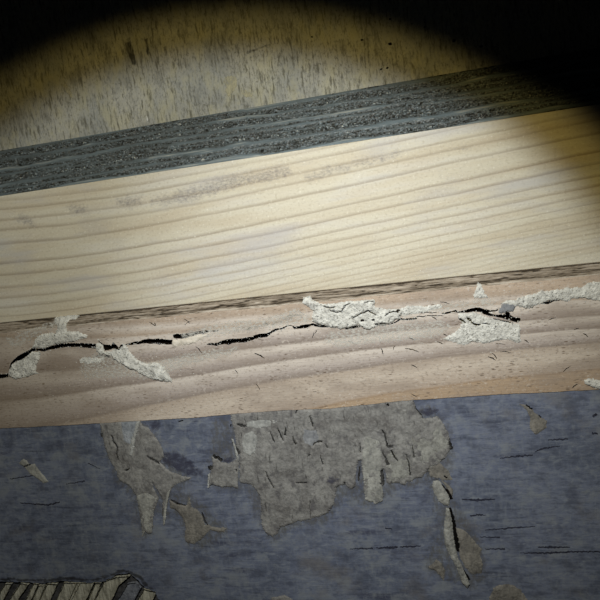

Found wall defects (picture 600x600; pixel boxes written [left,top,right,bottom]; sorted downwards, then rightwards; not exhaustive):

crack [375,302,521,326]
crack [0,319,327,378]